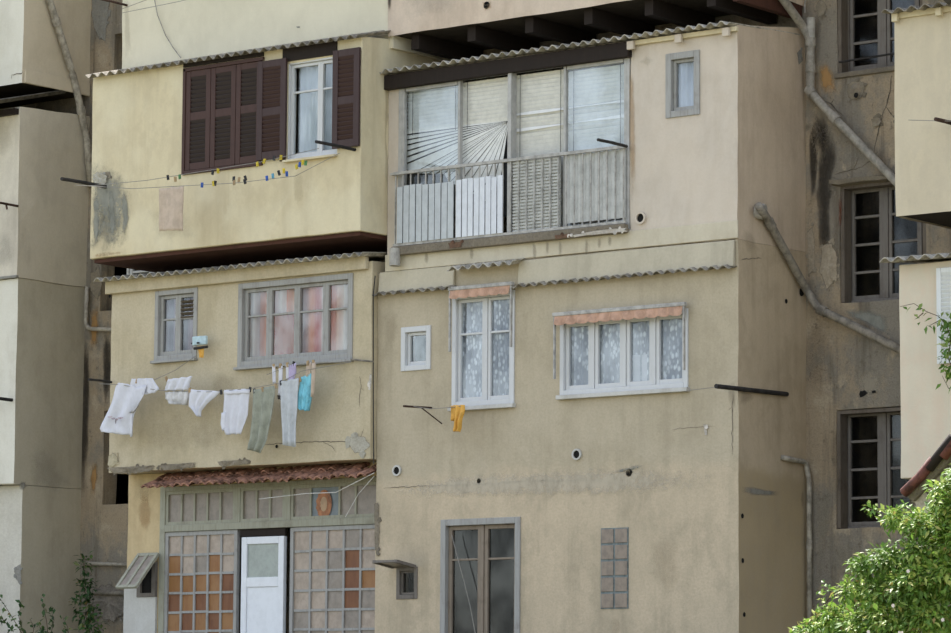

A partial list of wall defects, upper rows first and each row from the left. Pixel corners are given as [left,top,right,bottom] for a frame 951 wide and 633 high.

damp [94,178,128,242]
damp [810,122,834,245]